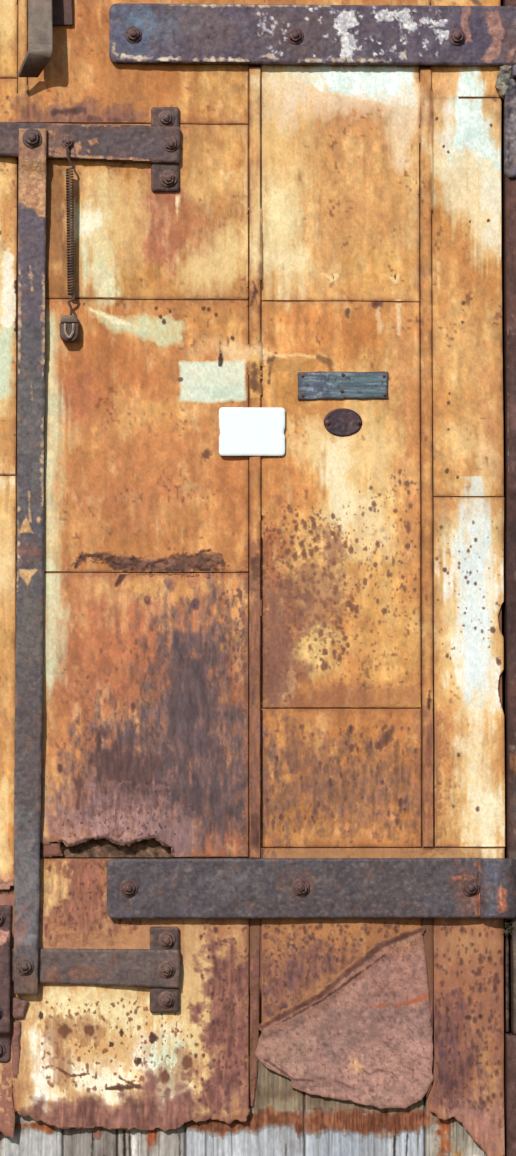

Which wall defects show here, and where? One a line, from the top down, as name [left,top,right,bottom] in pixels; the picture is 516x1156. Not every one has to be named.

spalling [61,587,247,840]
rust [39,536,461,949]
rust [0,859,510,1156]